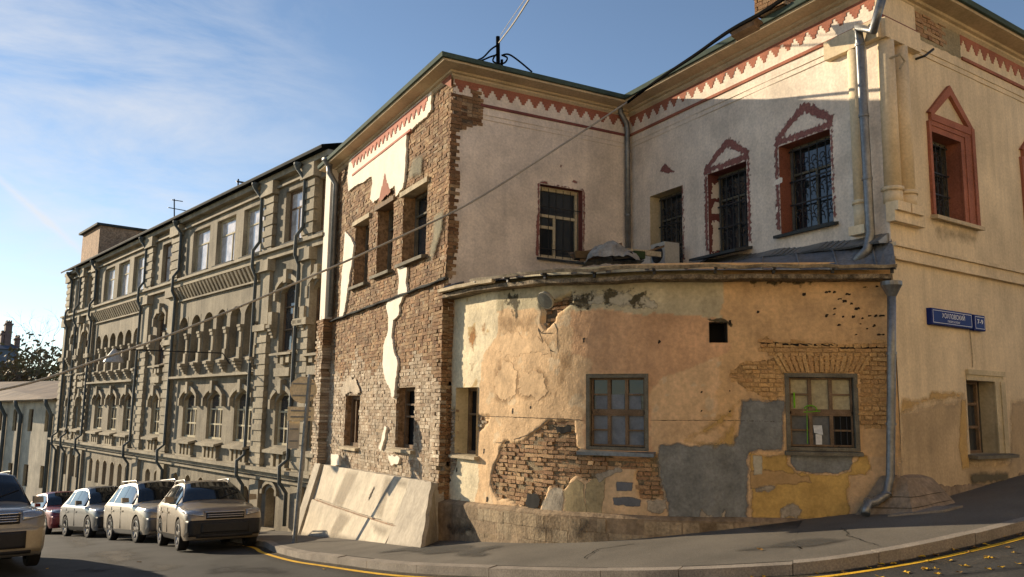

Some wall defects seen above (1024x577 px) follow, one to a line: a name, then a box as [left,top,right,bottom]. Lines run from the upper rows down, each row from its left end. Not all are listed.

spalling [445,90,484,279]
peeling [711,182,720,254]
water stain [505,289,520,319]
peeling [544,291,658,328]
water stain [570,288,646,311]
spalling [729,291,887,429]
spalling [486,420,664,509]